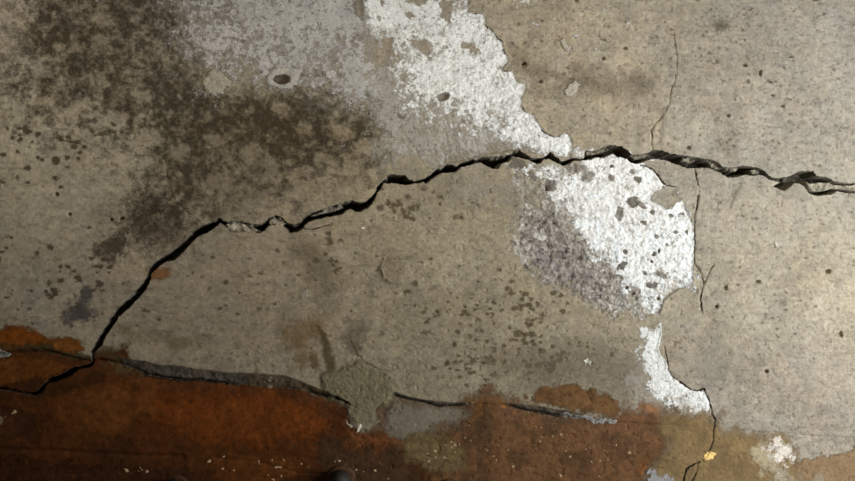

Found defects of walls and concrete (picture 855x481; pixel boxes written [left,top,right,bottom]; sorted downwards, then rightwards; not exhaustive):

damp [0,107,47,156]
damp [9,0,384,327]
damp [377,195,418,221]
crack [0,38,855,396]
spalling [354,0,699,321]
rust [0,320,678,481]
peeling [659,340,715,416]
crack [665,349,716,481]